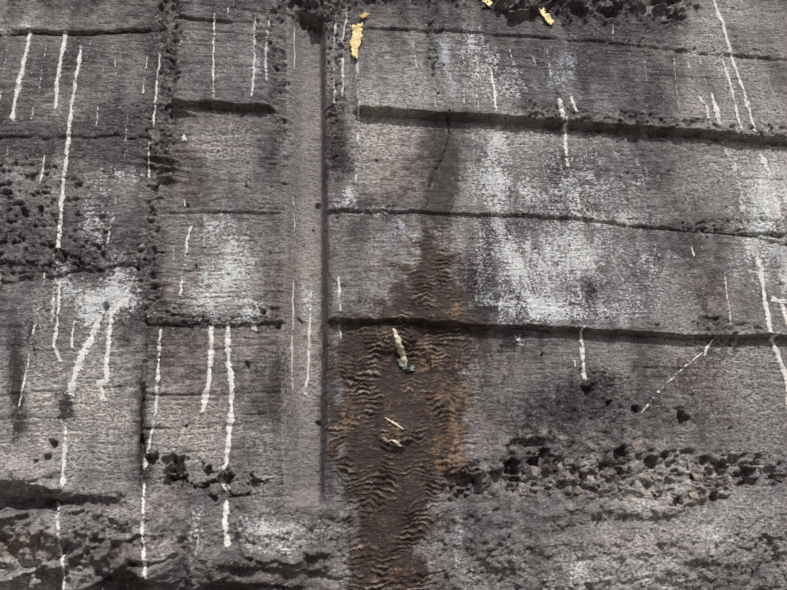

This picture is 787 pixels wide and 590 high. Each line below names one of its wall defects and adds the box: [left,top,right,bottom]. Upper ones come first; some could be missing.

water stain [0,22,33,121]
spalling [134,0,283,332]
spalling [246,0,370,170]
spalling [473,0,694,26]
spalling [518,99,787,148]
water stain [6,28,151,486]
crack [137,383,145,487]
water stain [142,329,162,470]
water stain [173,202,329,561]
corrosion [323,111,515,590]
spalling [445,362,787,510]
water stain [720,135,787,409]